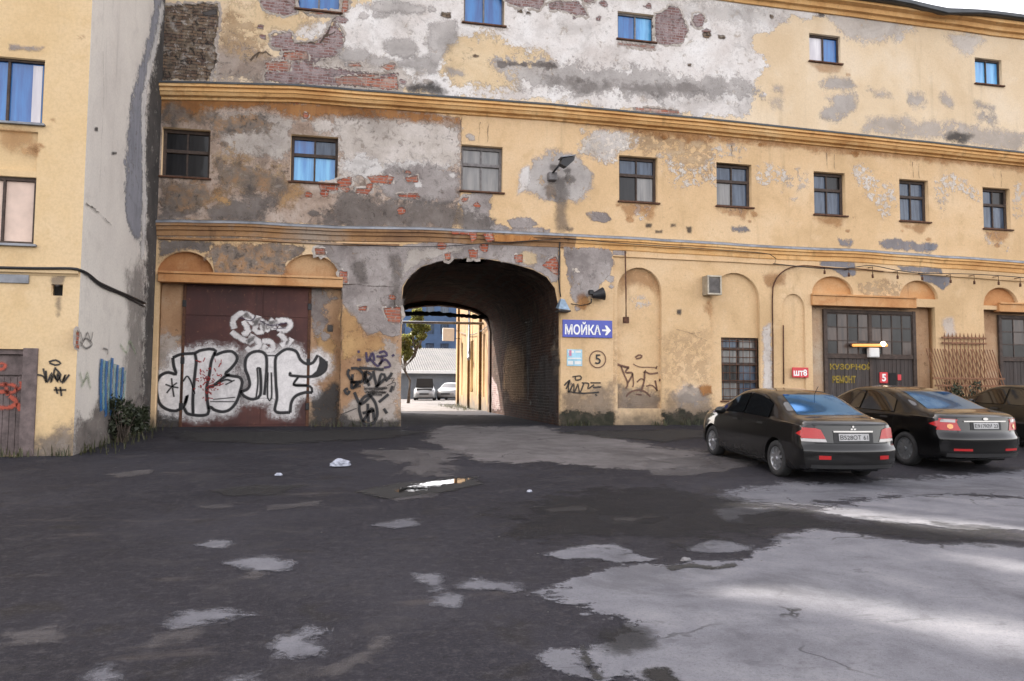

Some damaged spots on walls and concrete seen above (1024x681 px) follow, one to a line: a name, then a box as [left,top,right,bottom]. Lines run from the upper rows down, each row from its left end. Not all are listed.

water stain [34,0,336,456]
flaking render [208,103,624,423]
peeling [113,0,912,245]
flaking render [863,101,1024,150]